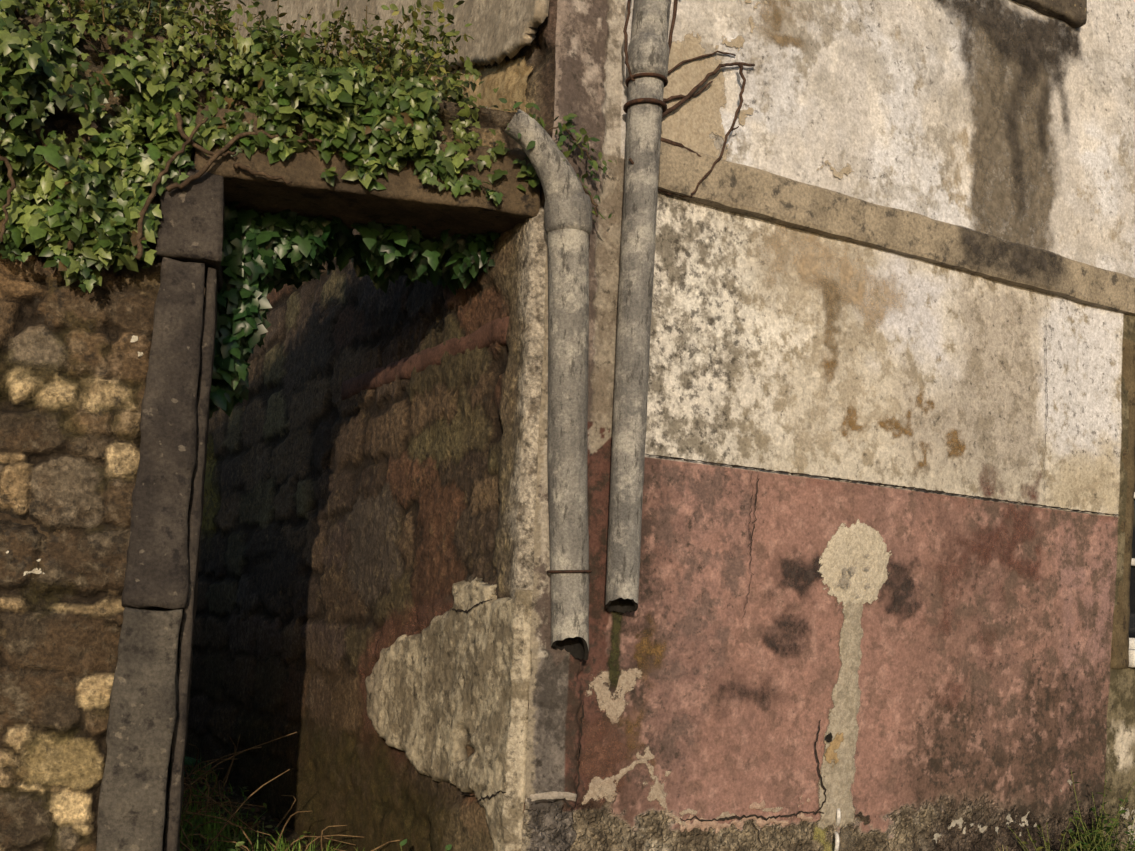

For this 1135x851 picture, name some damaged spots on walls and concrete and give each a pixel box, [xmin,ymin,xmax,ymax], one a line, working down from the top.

water stain [962,8,1068,282]
flaking render [365,577,814,851]
crack [680,720,827,844]
flaking render [825,732,844,768]